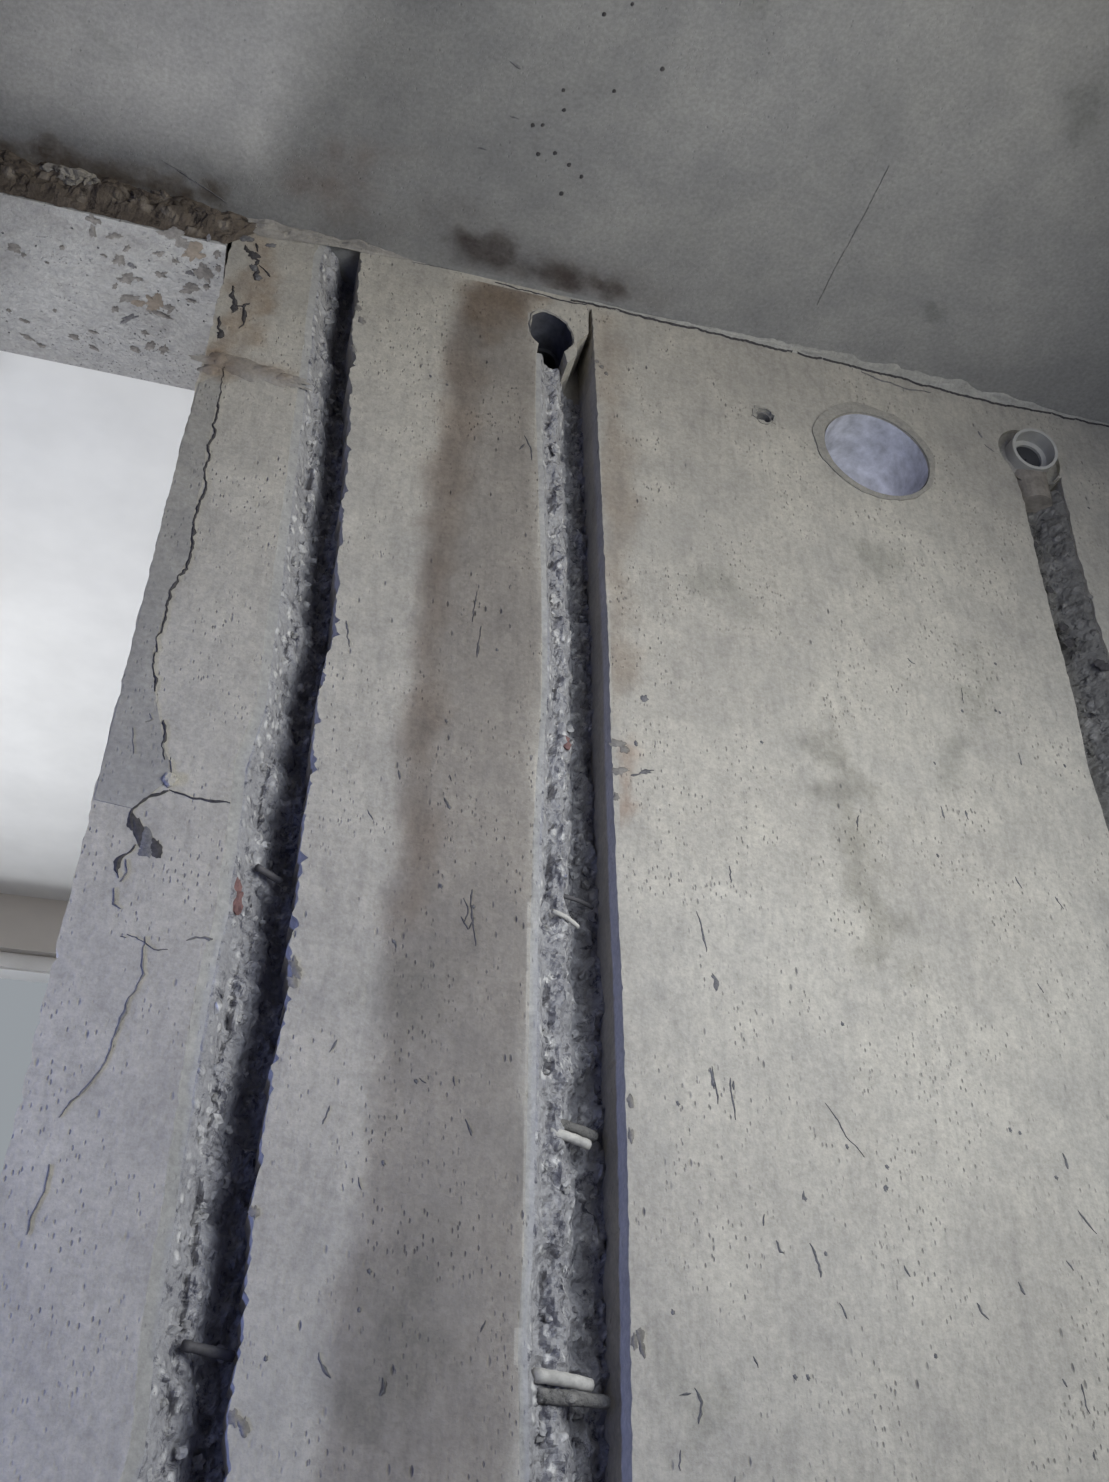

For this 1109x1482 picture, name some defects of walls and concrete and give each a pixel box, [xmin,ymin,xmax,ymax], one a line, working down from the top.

crack [495,282,1109,427]
crack [59,367,230,1118]
crack [27,1164,50,1234]